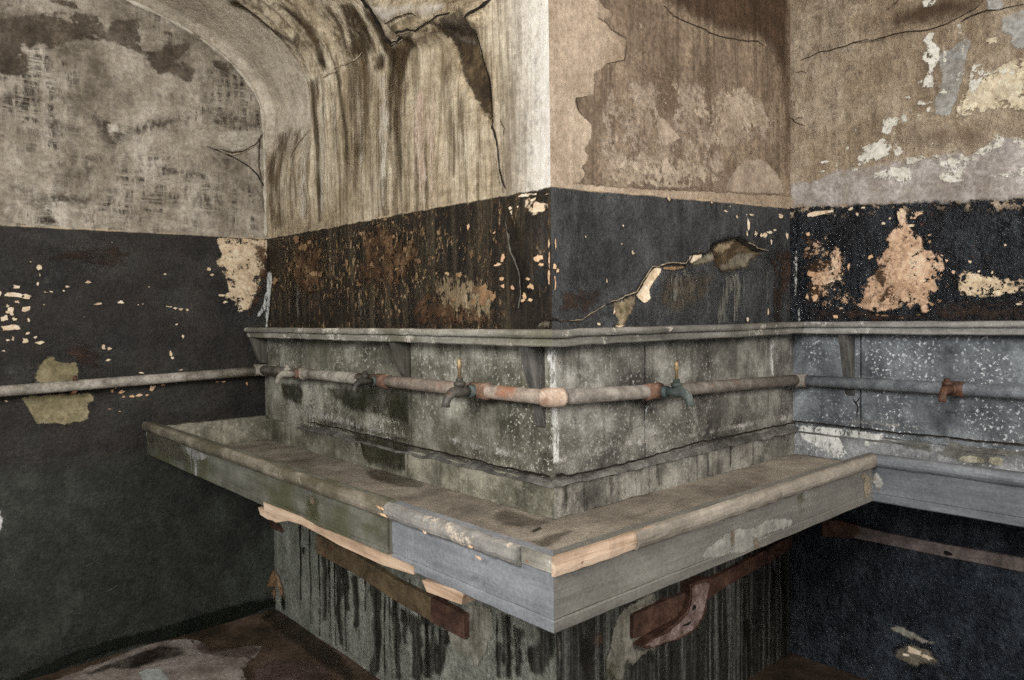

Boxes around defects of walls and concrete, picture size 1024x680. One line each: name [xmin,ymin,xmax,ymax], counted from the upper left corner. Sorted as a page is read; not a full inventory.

crack [322,0,490,77]
crack [796,0,1024,73]
damp [268,4,435,226]
crack [491,119,505,188]
peeling [574,0,1024,327]
peeling [0,261,69,351]
peeling [207,193,549,326]
peeling [534,239,559,287]
crack [533,237,769,327]
damp [282,384,421,486]
damp [15,525,450,680]
damp [495,614,560,680]